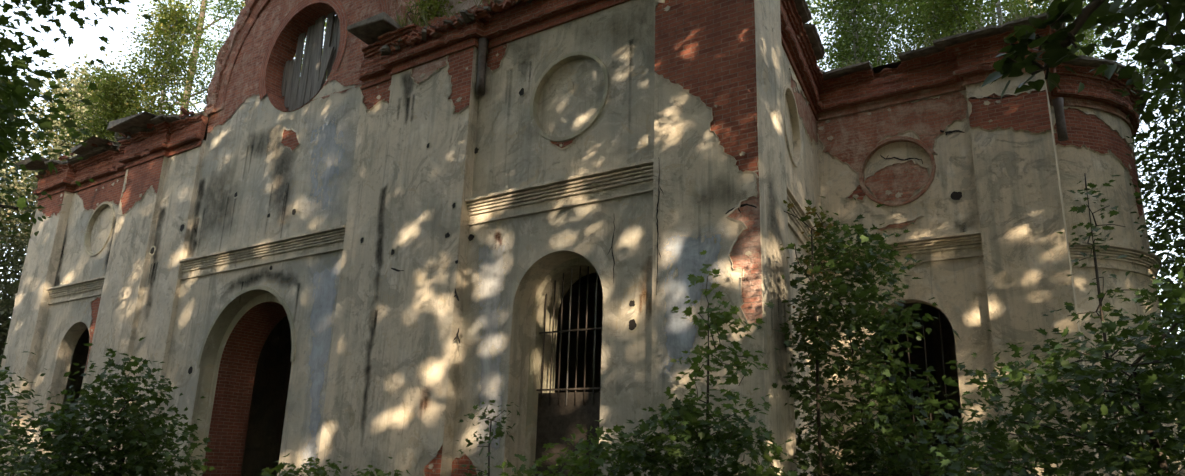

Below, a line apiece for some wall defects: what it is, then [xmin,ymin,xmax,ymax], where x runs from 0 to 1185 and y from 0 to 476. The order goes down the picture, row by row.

peeling [361,80,391,112]
peeling [410,43,509,115]
peeling [36,156,164,217]
peeling [280,127,301,153]
peeling [654,0,763,326]
peeling [789,68,1144,222]
peeling [423,444,479,476]